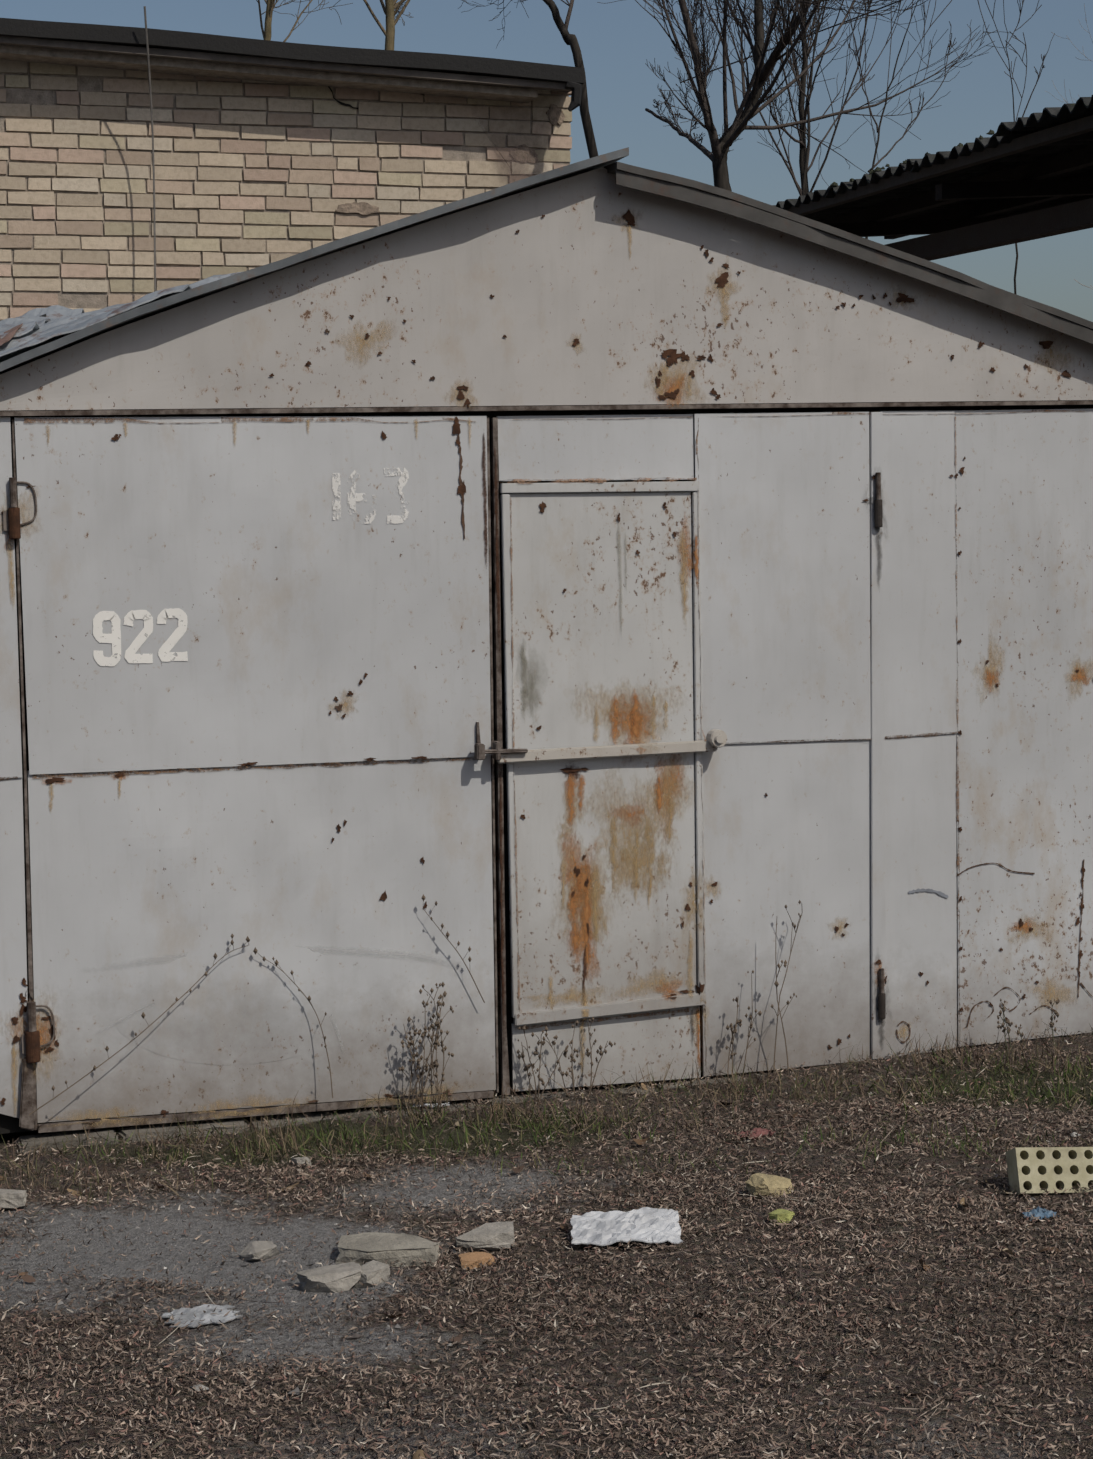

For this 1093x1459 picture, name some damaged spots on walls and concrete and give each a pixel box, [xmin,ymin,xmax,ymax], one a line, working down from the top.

corrosion [701,245,741,327]
corrosion [599,349,713,419]
corrosion [199,385,701,747]
corrosion [984,653,998,687]
corrosion [1072,664,1087,683]
corrosion [495,760,717,1071]
corrosion [1016,919,1037,935]
corrosion [11,978,59,1101]